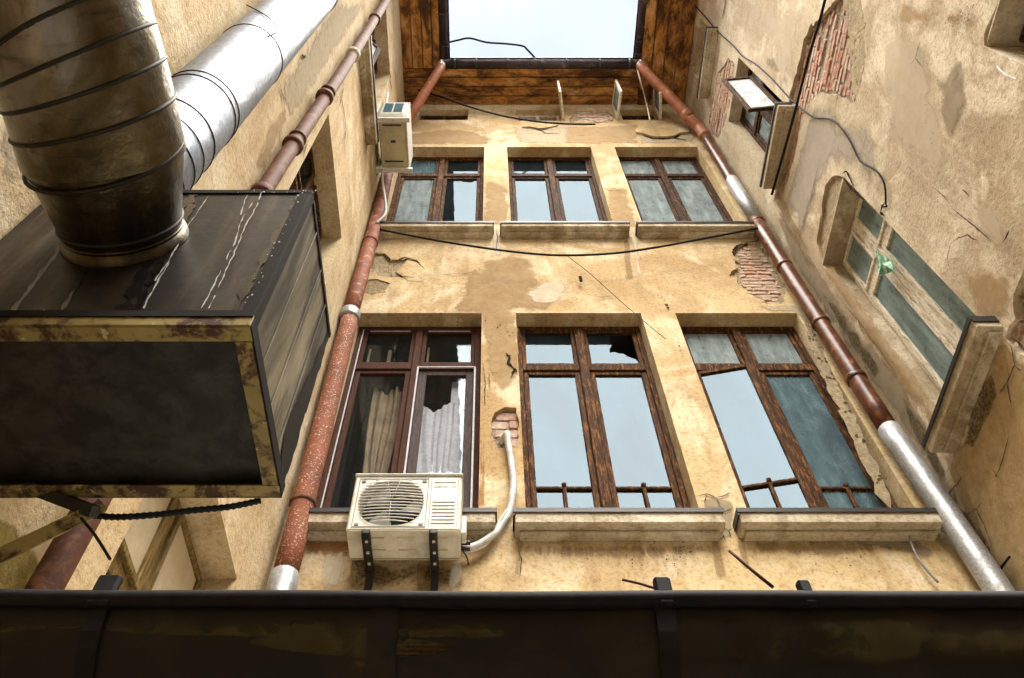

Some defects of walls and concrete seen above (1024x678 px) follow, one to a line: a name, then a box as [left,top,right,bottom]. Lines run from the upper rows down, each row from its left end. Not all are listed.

spalling [710,59,736,138]
spalling [779,0,867,199]
spalling [364,252,415,295]
water stain [458,182,564,388]
crack [483,353,517,399]
spalling [730,241,891,508]
spalling [491,411,519,450]